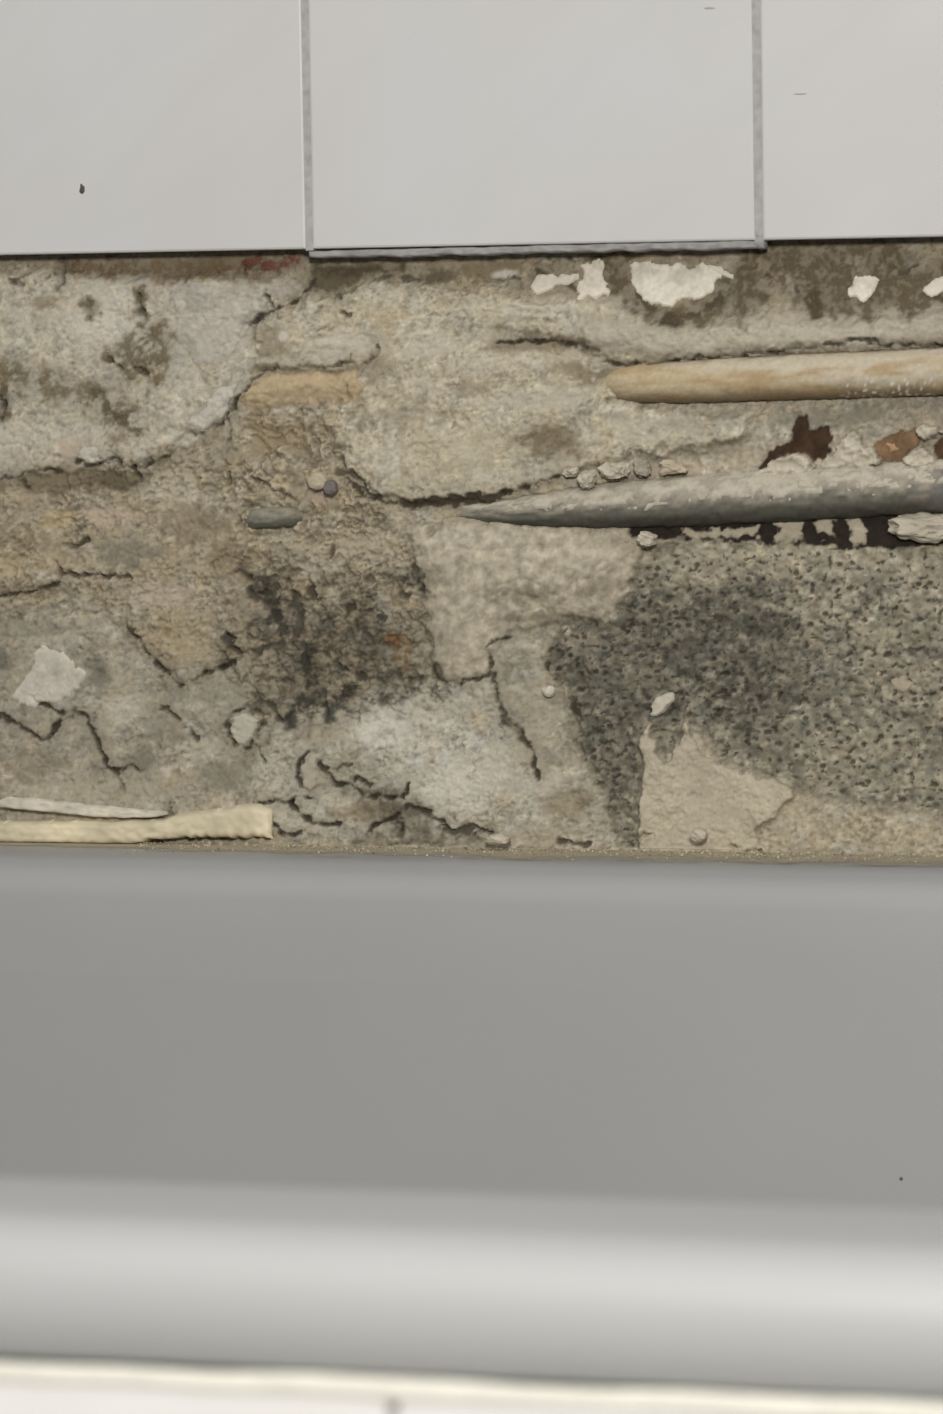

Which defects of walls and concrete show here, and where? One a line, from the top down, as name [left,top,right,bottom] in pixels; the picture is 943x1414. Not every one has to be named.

peeling [530,258,610,300]
peeling [629,261,734,308]
peeling [848,275,879,303]
rust [759,415,833,469]
rust [873,428,943,462]
crack [348,469,581,508]
peeling [13,646,86,707]
crack [0,702,137,774]
leakage [239,567,424,729]
crack [433,637,540,780]
spalling [542,515,943,847]
crack [259,752,445,836]